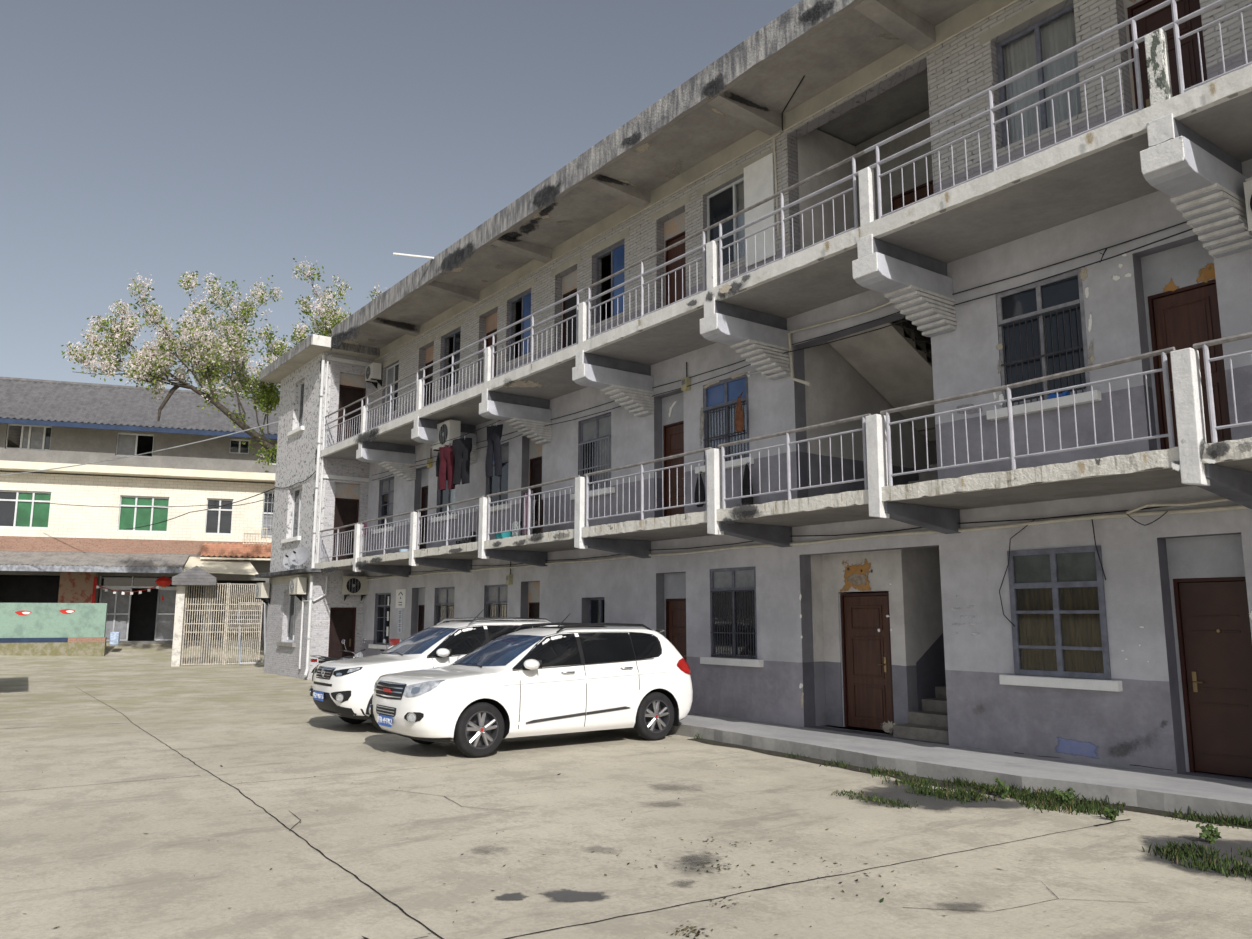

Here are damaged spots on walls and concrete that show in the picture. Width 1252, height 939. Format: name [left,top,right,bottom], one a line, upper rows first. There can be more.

spalling [1200,439,1216,464]